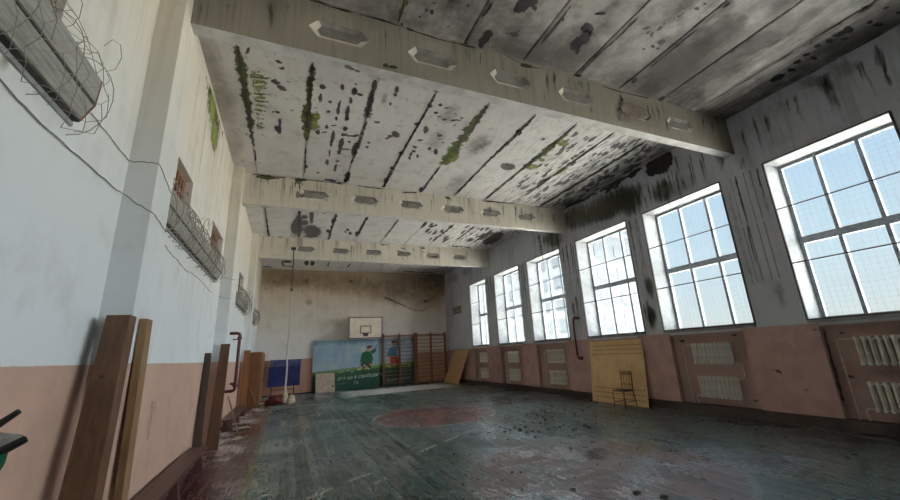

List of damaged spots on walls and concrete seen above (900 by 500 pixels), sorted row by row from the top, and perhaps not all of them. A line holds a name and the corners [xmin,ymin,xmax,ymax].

leakage [207,84,223,136]
leakage [237,50,277,161]
leakage [287,67,314,141]
leakage [452,106,488,152]
peeling [516,131,673,207]
leakage [563,158,656,210]